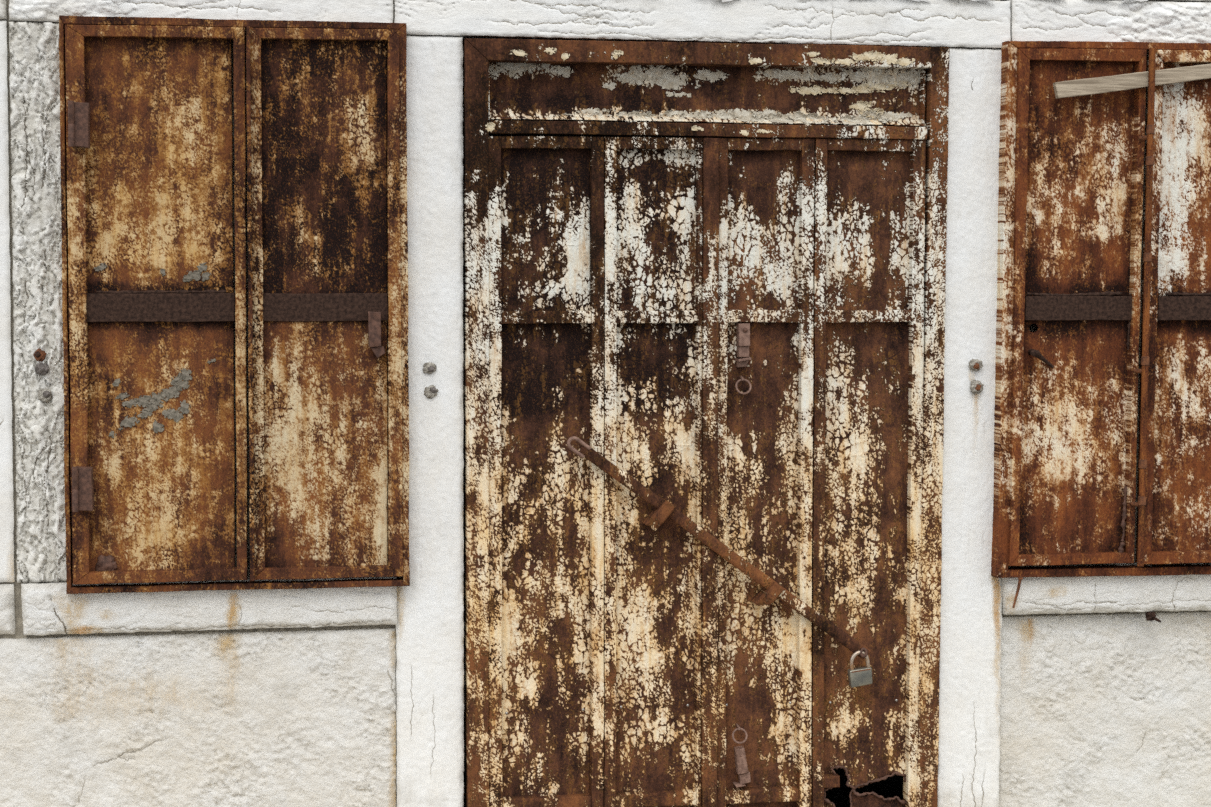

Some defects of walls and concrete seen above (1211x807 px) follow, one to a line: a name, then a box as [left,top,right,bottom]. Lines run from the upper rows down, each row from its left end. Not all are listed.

crack [0,411,53,569]